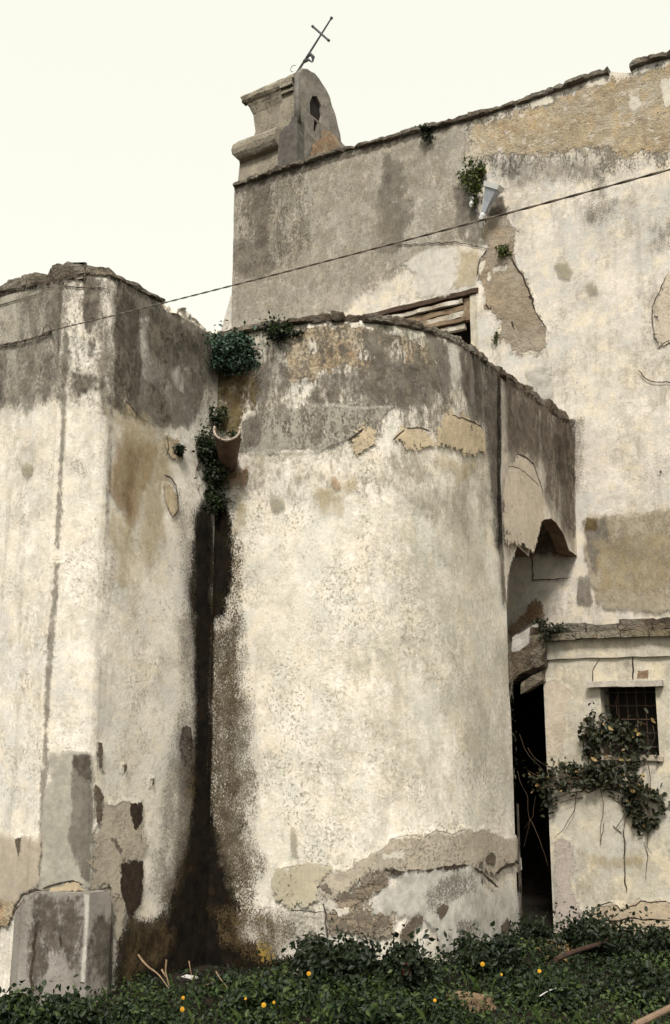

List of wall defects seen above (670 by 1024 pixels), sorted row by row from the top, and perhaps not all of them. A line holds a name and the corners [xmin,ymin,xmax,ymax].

flaking render [465,63,670,161]
leakage [232,77,670,605]
flaking render [475,206,550,358]
crack [652,275,669,347]
leakage [0,275,220,548]
flaking render [161,433,184,464]
flaking render [394,409,487,457]
flaking render [502,453,546,553]
leakage [0,487,330,1001]
flaking render [0,899,20,934]
flaking render [39,738,156,954]
peeling [270,823,522,945]